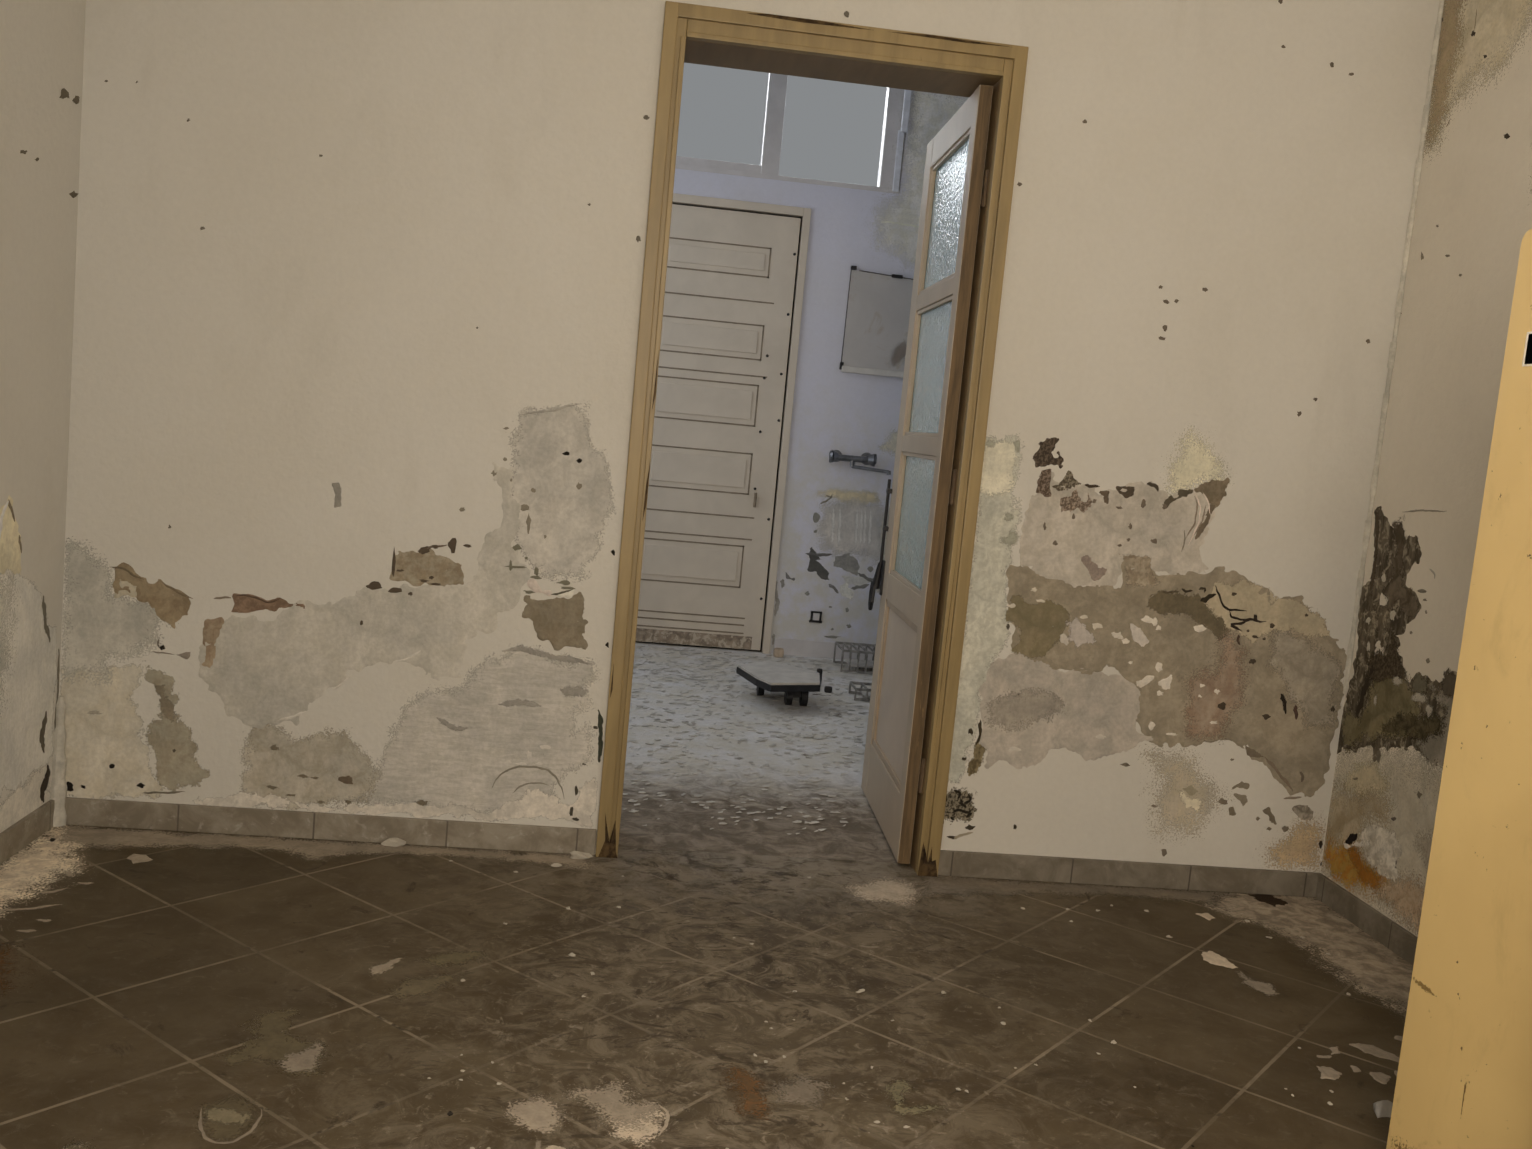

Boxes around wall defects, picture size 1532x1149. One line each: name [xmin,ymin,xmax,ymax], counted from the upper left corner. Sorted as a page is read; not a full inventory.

damp [1423,0,1532,161]
peeling [0,495,57,796]
damp [0,882,92,995]
damp [0,536,598,833]
peeling [112,404,615,729]
spalling [774,513,880,639]
peeling [978,437,1347,797]
damp [1120,506,1457,935]
spalling [1343,817,1402,882]